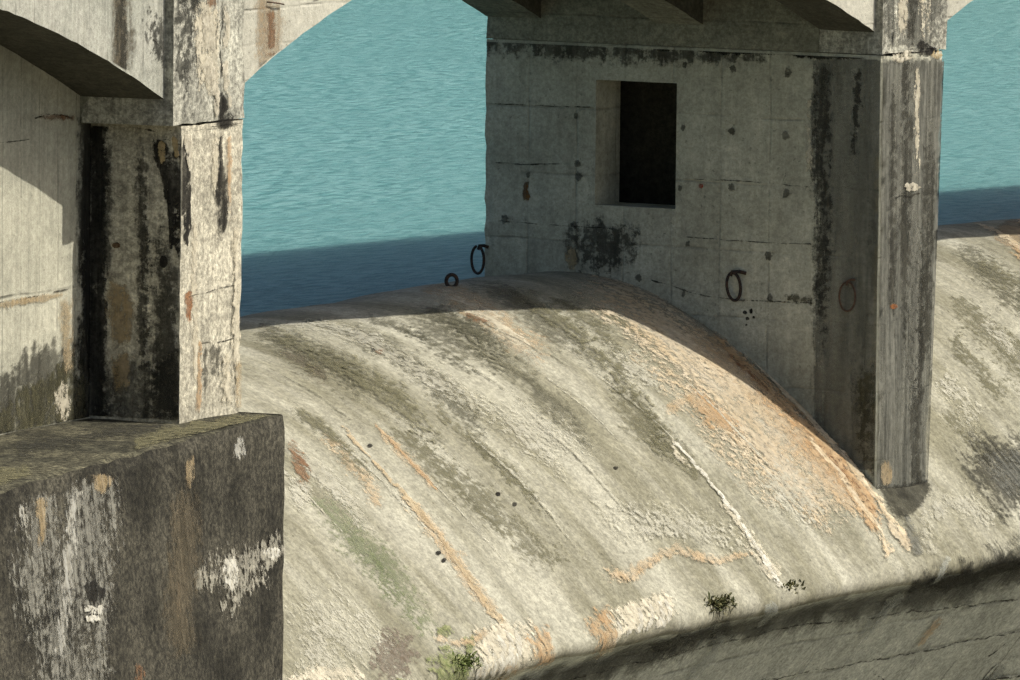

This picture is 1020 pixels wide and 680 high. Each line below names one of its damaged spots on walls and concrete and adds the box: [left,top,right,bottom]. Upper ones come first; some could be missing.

rust [258,0,280,65]
damp [64,117,114,419]
damp [133,139,203,409]
damp [212,132,241,405]
damp [234,437,246,459]
damp [258,317,679,564]
damp [420,282,548,360]
damp [284,383,1020,680]
damp [486,0,984,489]
rust [577,273,911,556]
damp [948,296,1020,397]
rust [974,219,1020,259]